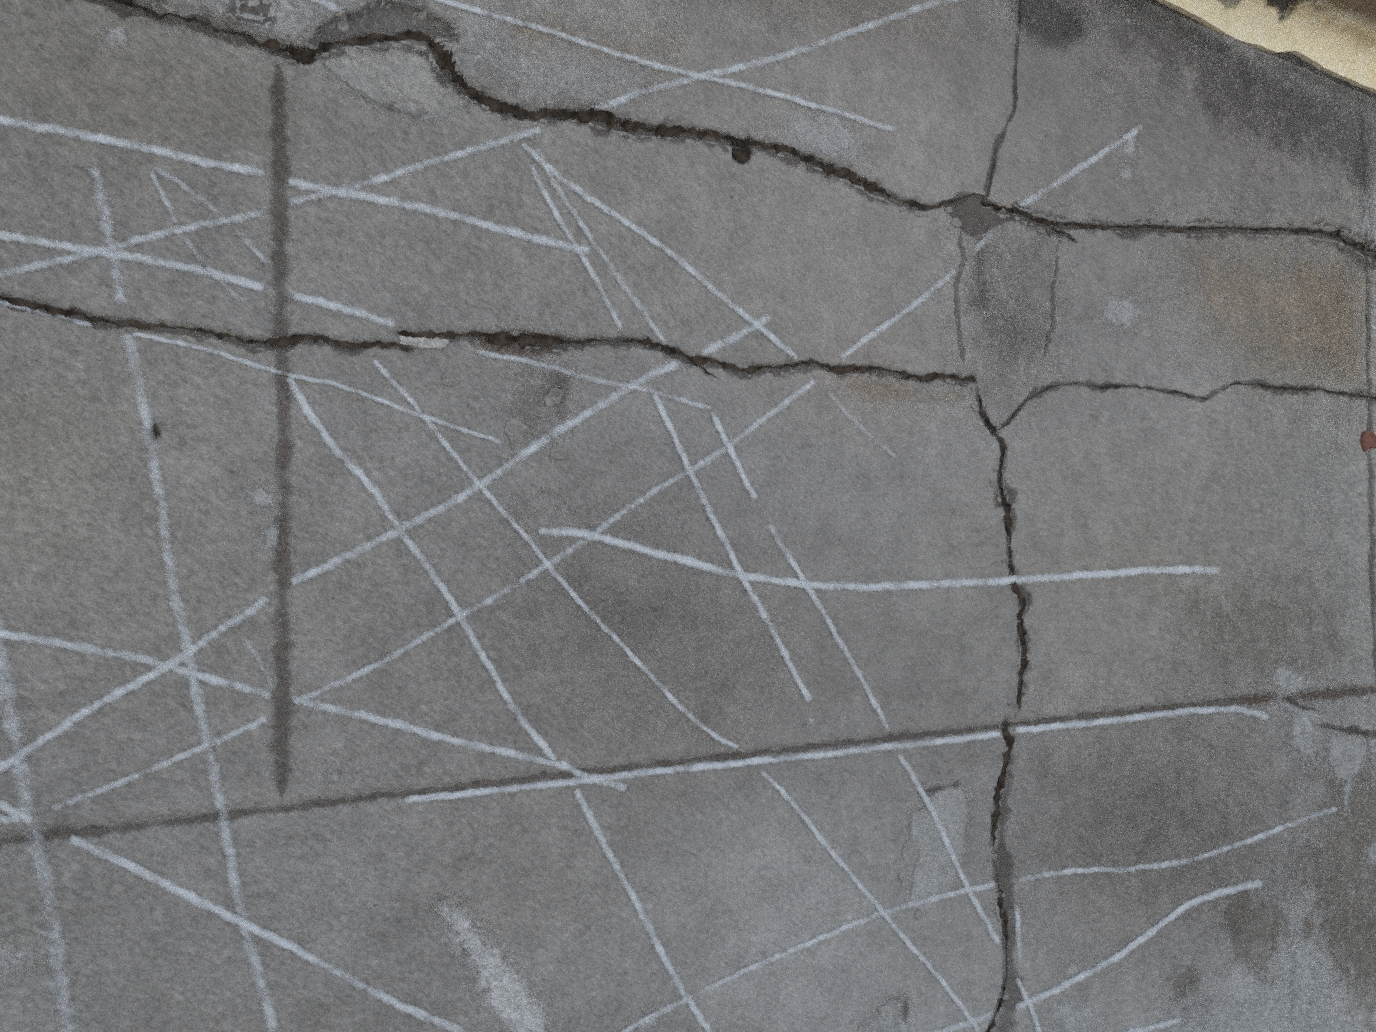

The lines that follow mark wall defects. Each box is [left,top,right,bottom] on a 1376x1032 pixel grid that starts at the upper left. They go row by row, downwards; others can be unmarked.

crack [100,0,1376,269]
crack [0,293,1376,1032]
water stain [1172,769,1376,1032]